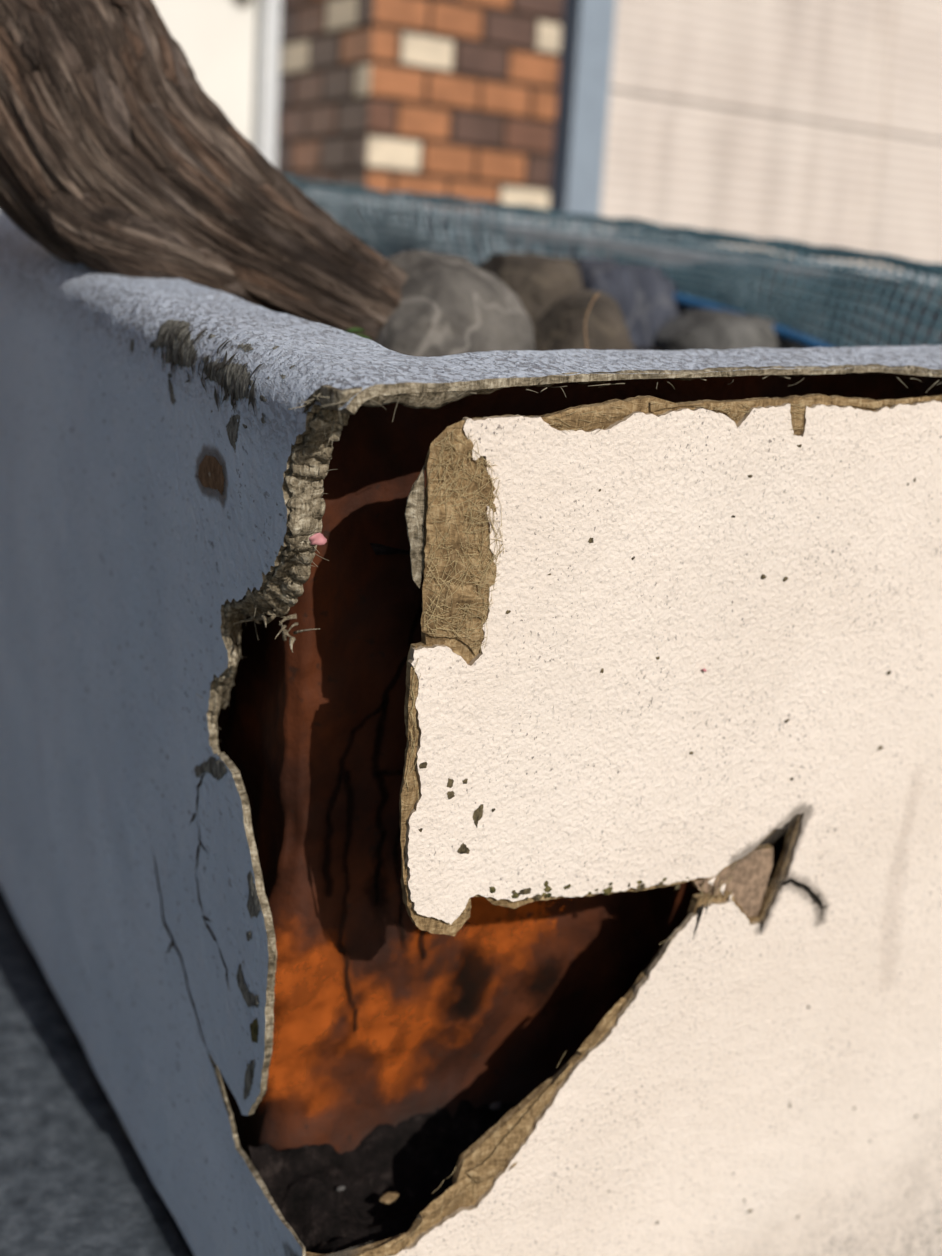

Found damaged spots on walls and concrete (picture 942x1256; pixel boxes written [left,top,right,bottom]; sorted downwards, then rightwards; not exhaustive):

peeling [150,319,295,451]
spalling [194,364,942,780]
crack [152,850,206,1047]
crack [189,771,228,985]
peeling [246,870,260,941]
spalling [400,658,427,885]
peeling [447,778,468,799]
peeling [473,804,495,827]
peeling [512,881,571,901]
peeling [628,844,773,917]
crack [782,879,828,920]
spalling [358,992,634,1256]